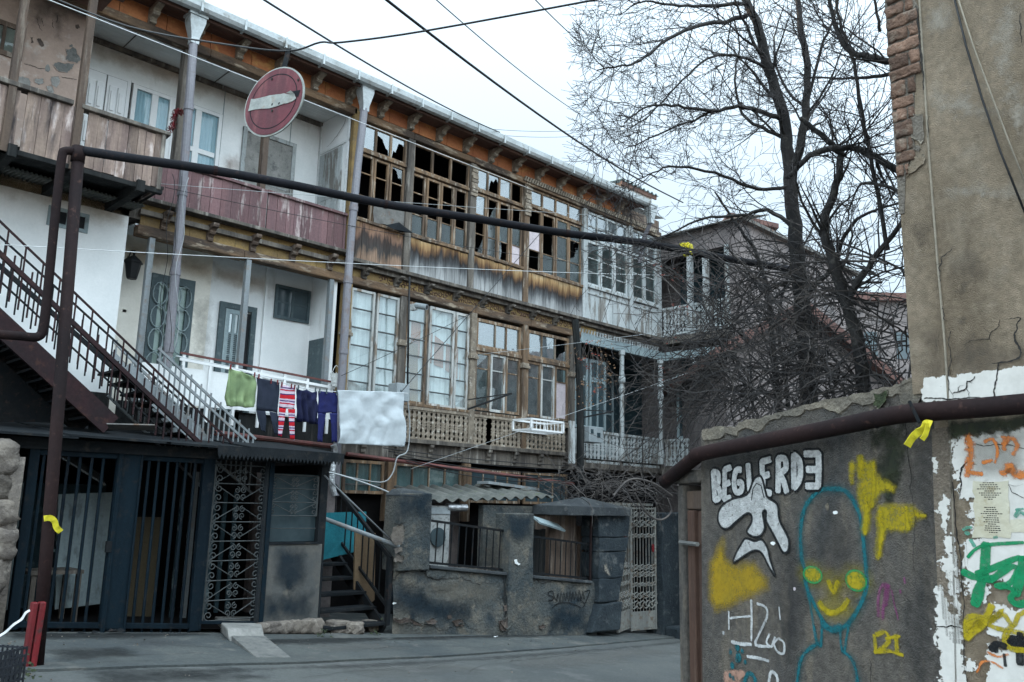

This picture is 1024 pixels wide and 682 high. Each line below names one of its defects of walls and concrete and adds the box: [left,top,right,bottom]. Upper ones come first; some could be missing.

spalling [18,44,81,93]
peeling [873,366,1024,409]
crack [924,306,1024,681]
damp [268,553,306,615]
peeling [931,427,1024,682]